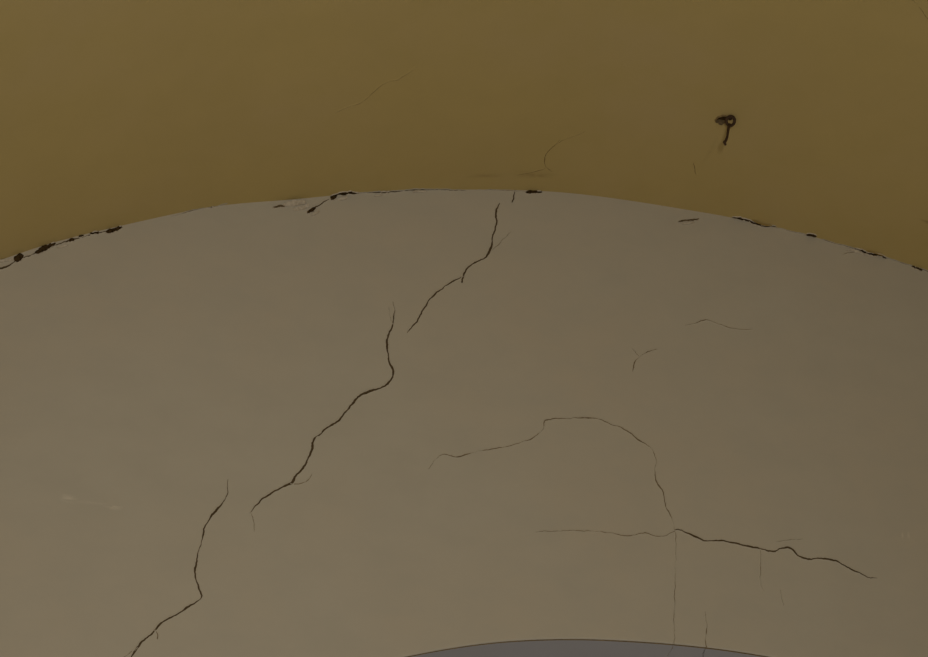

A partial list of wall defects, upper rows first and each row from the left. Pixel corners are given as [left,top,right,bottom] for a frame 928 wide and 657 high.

crack [249,190,516,532]
crack [123,479,229,657]
crack [427,416,877,657]